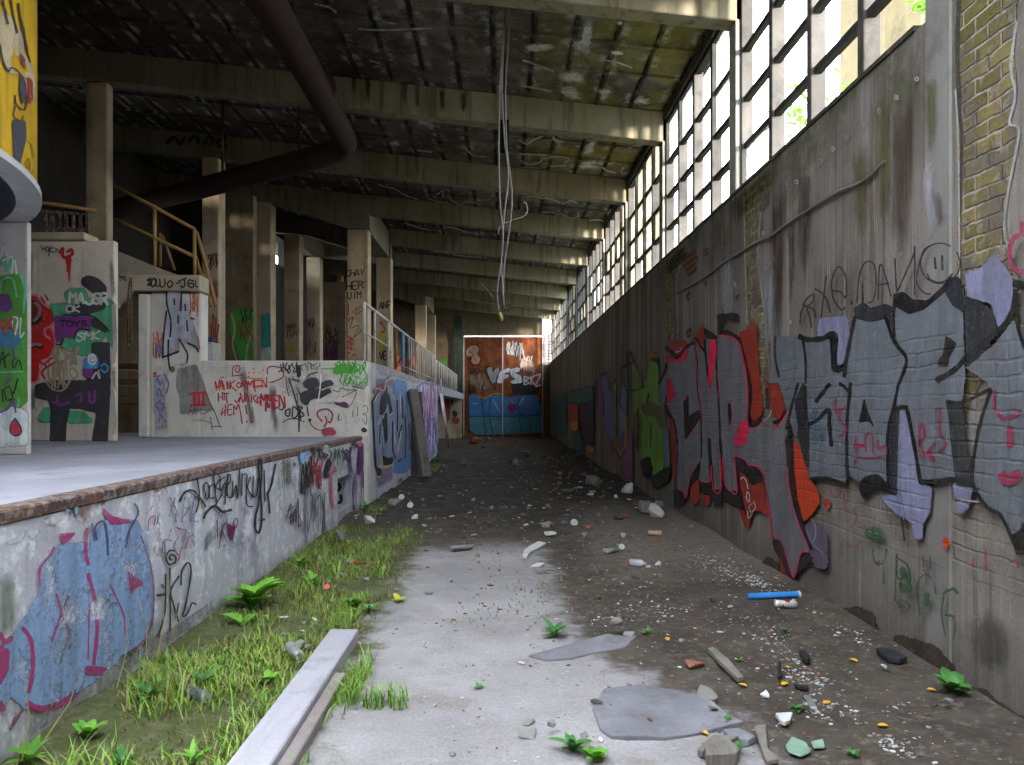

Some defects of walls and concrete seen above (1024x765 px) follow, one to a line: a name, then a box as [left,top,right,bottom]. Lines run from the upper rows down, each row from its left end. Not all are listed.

flaking render [733,175,771,396]
damp [762,185,809,345]
damp [879,102,911,239]
damp [926,84,935,144]
damp [925,170,941,228]
flaking render [954,0,1021,353]
flaking render [959,312,983,412]